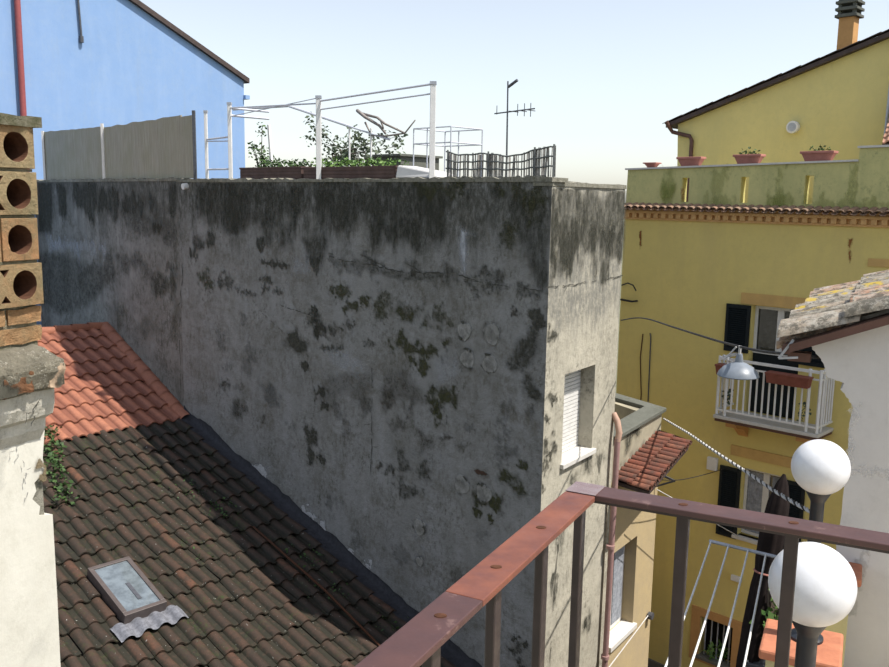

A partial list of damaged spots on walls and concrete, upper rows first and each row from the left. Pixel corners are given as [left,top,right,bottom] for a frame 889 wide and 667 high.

water stain [38,182,177,243]
water stain [189,183,305,295]
water stain [305,182,504,298]
water stain [517,188,626,297]
crack [330,255,623,293]
water stain [288,327,309,372]
water stain [308,305,355,351]
flaking render [47,363,66,388]
water stain [507,306,557,493]
water stain [304,425,326,465]
water stain [376,451,431,499]